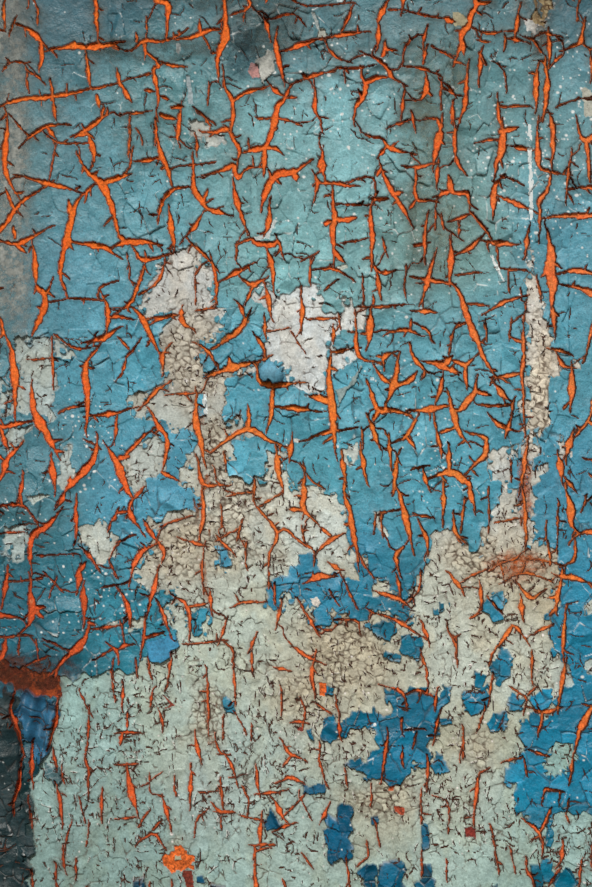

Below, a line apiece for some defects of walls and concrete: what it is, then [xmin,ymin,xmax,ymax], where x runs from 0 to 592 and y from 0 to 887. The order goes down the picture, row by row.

peeling [0,244,592,887]
rust [0,656,63,699]
crack [355,653,407,702]
crack [378,648,469,773]
crack [0,688,42,817]
crack [187,729,211,766]
crack [353,783,383,856]
crack [379,703,592,887]
crack [116,857,154,887]
rust [162,845,196,887]
crack [193,843,245,887]
crack [345,829,379,887]